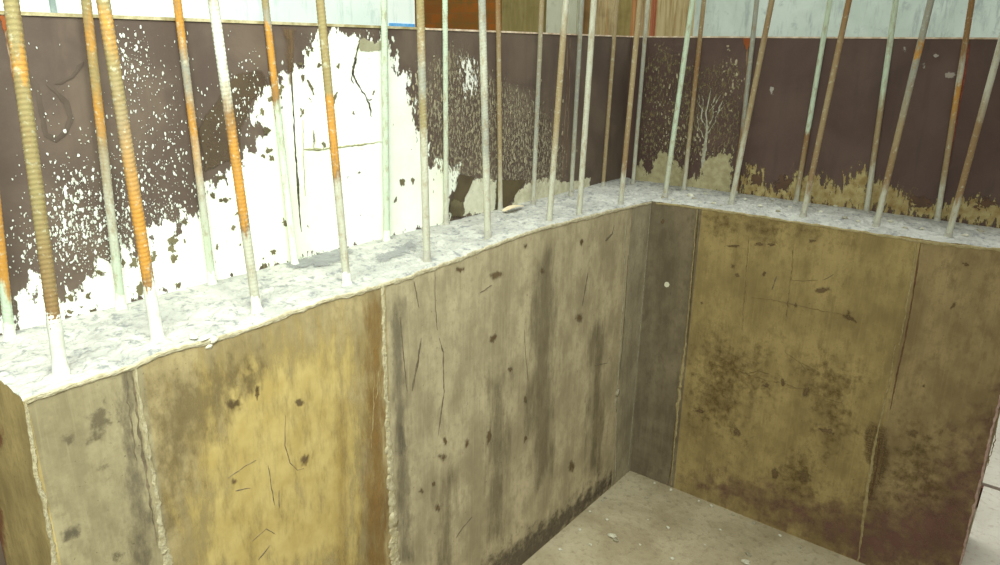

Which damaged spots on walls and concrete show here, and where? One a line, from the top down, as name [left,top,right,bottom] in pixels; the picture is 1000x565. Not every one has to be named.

peeling [0,0,619,377]
crack [288,30,380,232]
spalling [617,0,1000,238]
water stain [490,473,612,565]
water stain [719,450,984,565]
water stain [867,426,888,497]